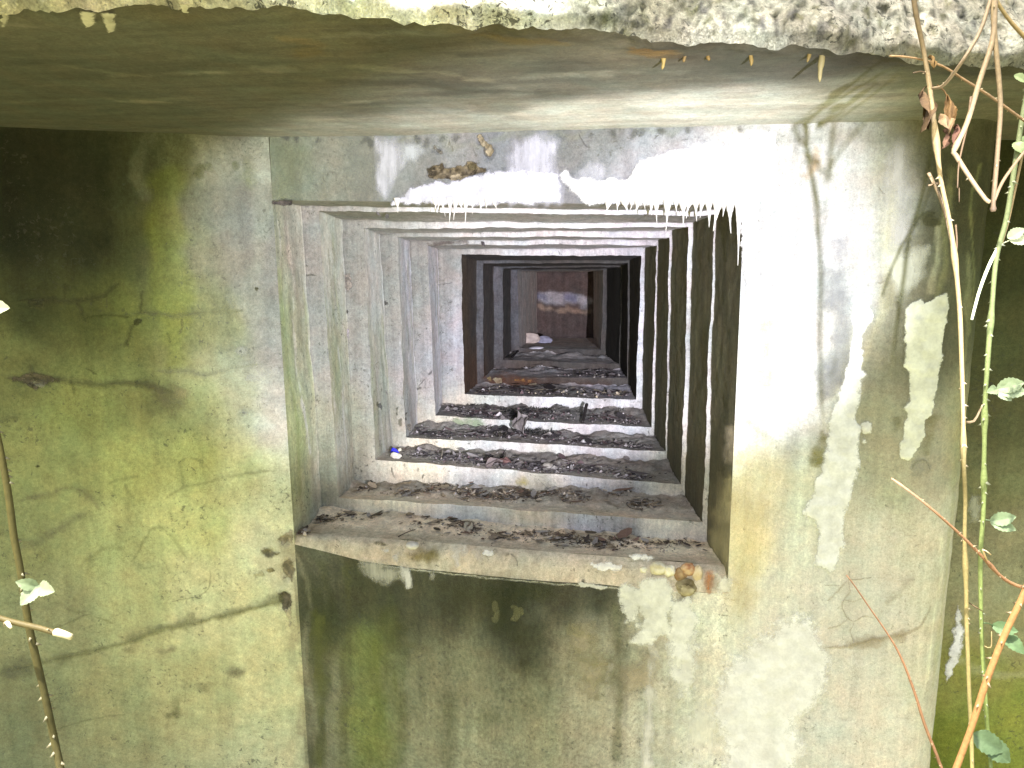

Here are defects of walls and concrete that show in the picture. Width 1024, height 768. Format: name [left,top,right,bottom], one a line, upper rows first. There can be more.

water stain [368,131,776,295]
peeling [899,293,949,462]
water stain [366,551,535,589]
water stain [548,578,700,699]
water stain [642,688,654,768]
water stain [689,615,831,768]